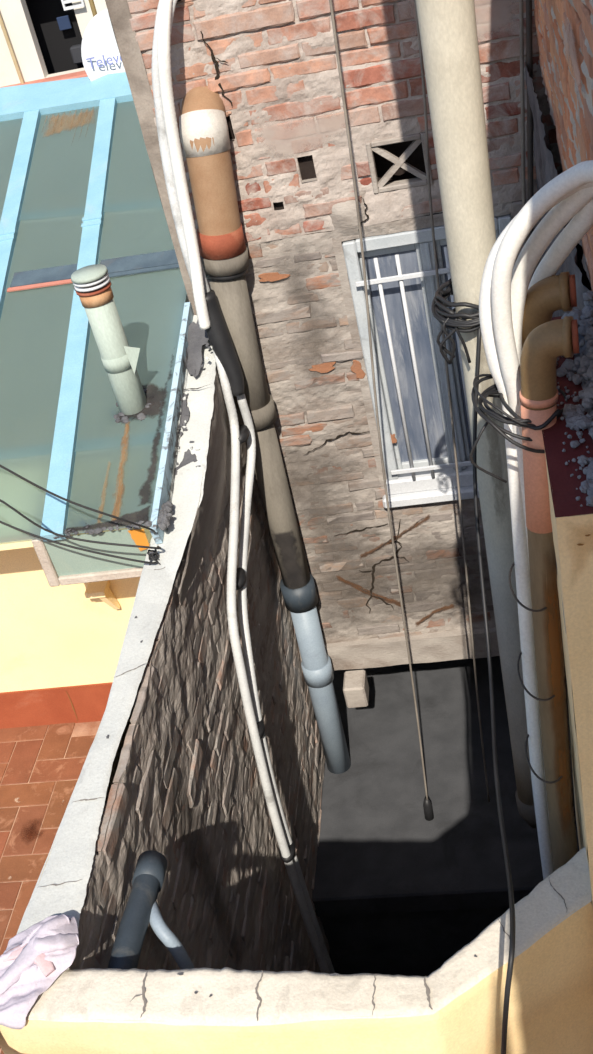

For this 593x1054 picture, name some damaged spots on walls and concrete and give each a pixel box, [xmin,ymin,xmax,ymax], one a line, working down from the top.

crack [200,31,232,106]
rust [100,423,129,521]
crack [335,522,409,613]
crack [132,970,149,1018]
crack [255,971,263,1021]
crack [424,976,433,1010]